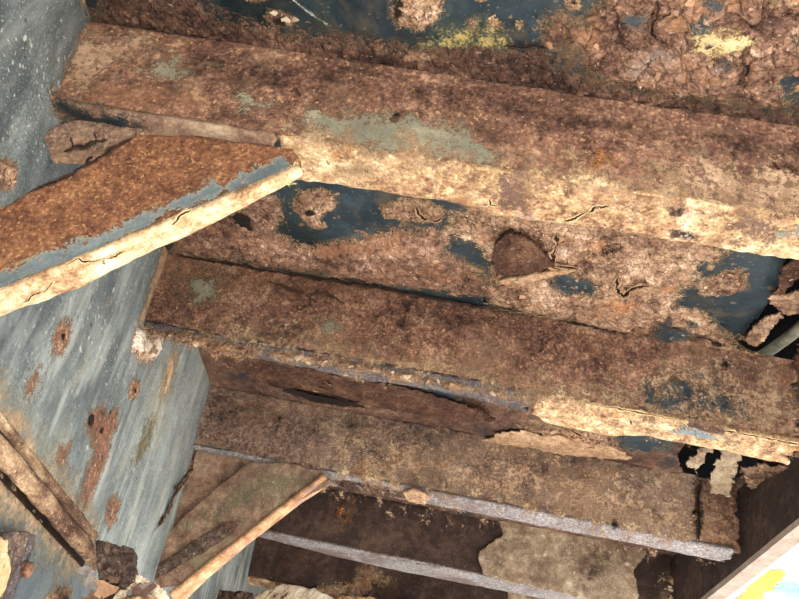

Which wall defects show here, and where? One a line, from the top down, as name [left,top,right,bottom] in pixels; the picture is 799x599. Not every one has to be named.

spalling [266,7,299,28]
crack [647,0,675,47]
crack [782,11,799,19]
corrosion [49,0,799,127]
spalling [532,0,799,115]
corrosion [0,156,18,193]
crack [26,133,133,195]
corrosion [277,116,477,182]
corrosion [34,137,799,559]
corrosion [0,363,123,531]
corrosion [0,471,85,599]